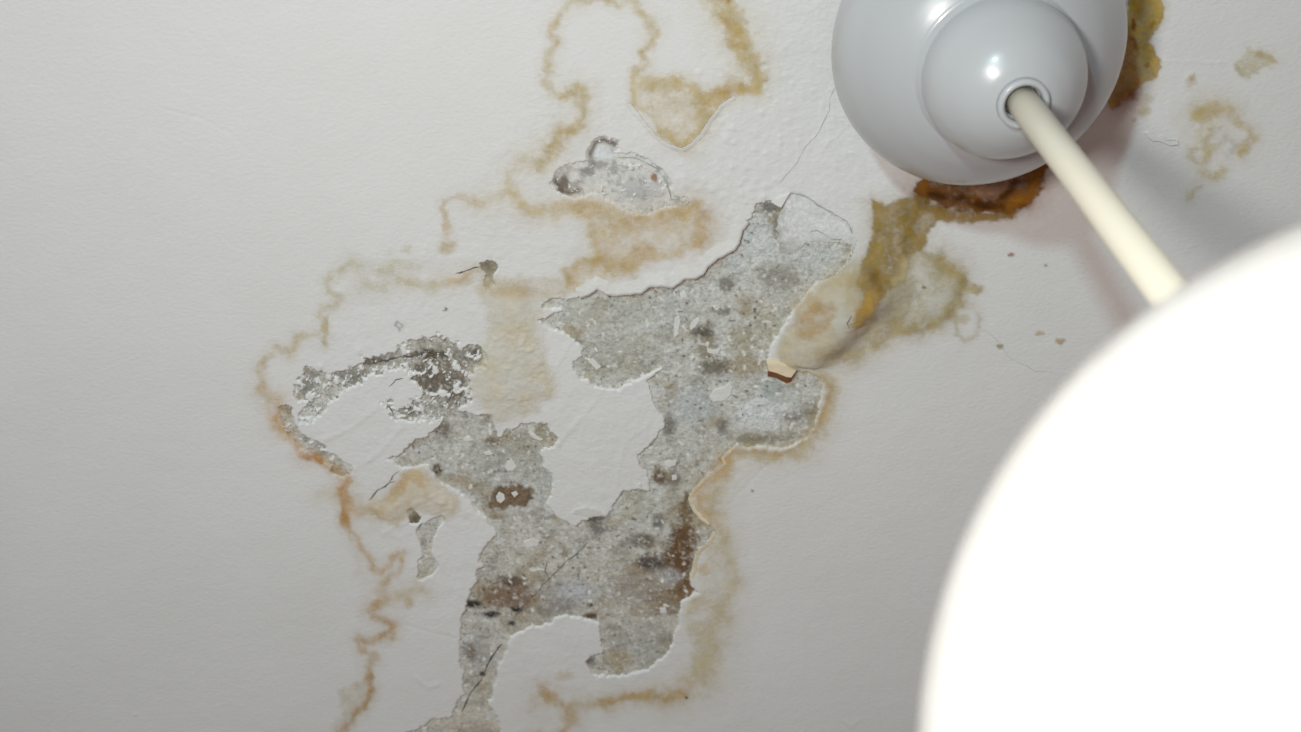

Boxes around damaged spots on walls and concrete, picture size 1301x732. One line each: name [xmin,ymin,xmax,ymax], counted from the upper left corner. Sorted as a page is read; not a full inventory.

damp [632,0,765,148]
peeling [626,96,736,152]
peeling [550,136,690,215]
damp [566,231,650,286]
damp [839,194,1017,361]
spalling [279,191,857,732]
damp [698,374,834,518]
damp [344,673,373,728]
damp [600,690,686,706]